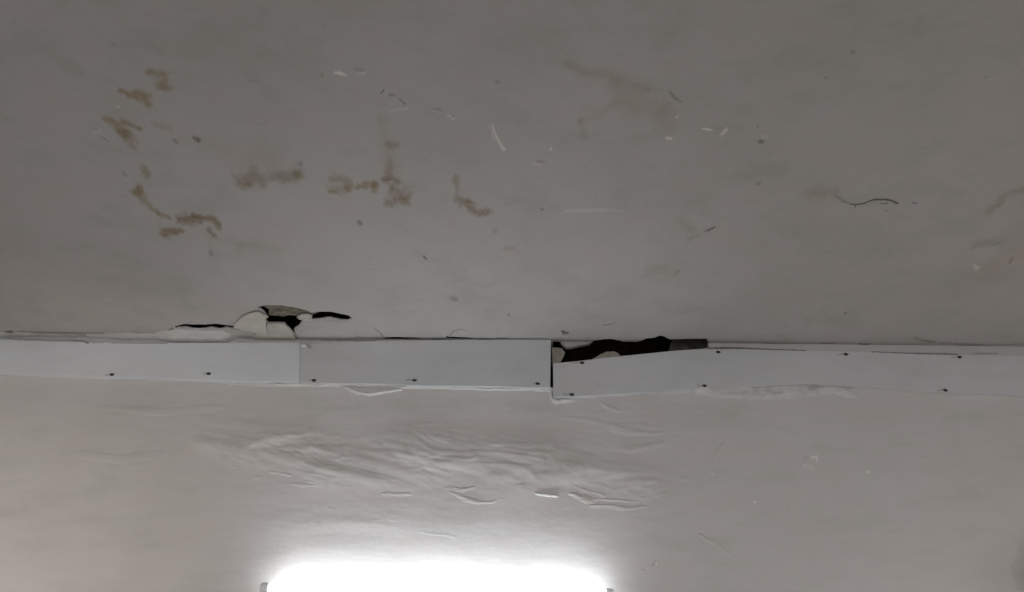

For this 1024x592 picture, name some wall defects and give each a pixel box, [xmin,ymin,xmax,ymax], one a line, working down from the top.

leakage [99,66,308,261]
leakage [324,111,416,210]
leakage [450,172,495,220]
crack [847,198,918,212]
flaking render [234,305,378,349]
flaking render [550,336,708,387]